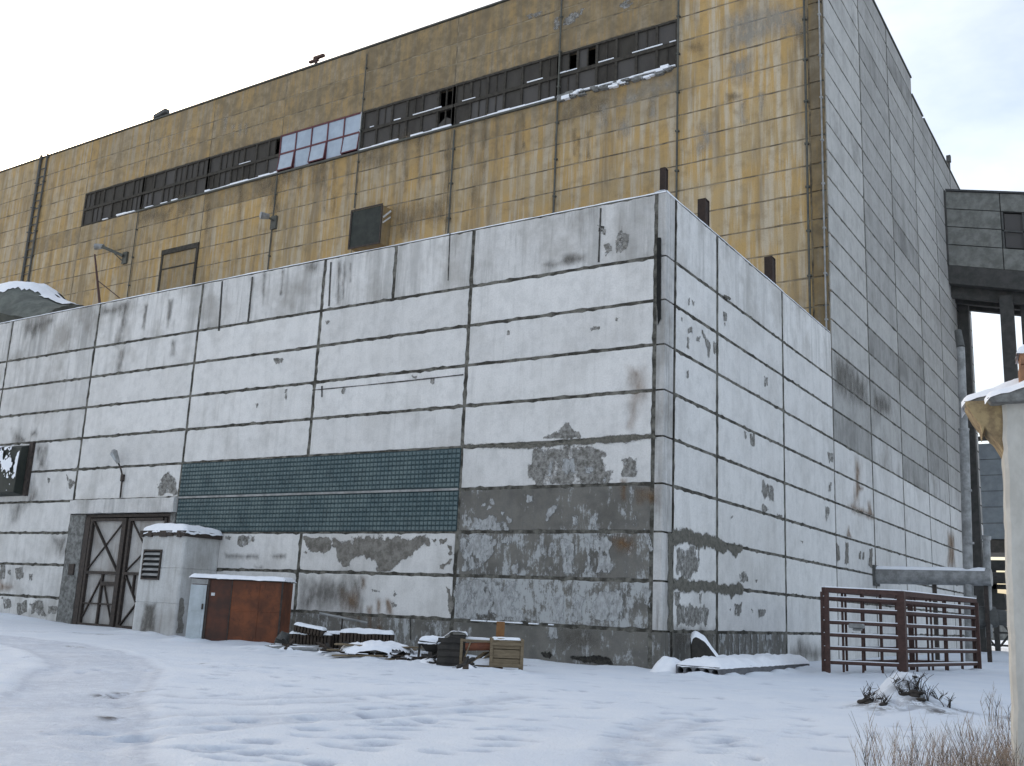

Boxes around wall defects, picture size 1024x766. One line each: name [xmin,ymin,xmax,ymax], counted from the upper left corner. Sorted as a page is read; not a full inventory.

peeling [597,225,629,256]
peeling [681,317,716,357]
peeling [526,423,637,503]
peeling [157,472,177,496]
peeling [761,480,782,517]
peeling [0,564,32,580]
spalling [303,534,452,572]
peeling [584,536,614,574]
peeling [676,546,700,580]
peeling [1,597,57,617]
peeling [446,582,477,619]
peeling [675,592,709,627]